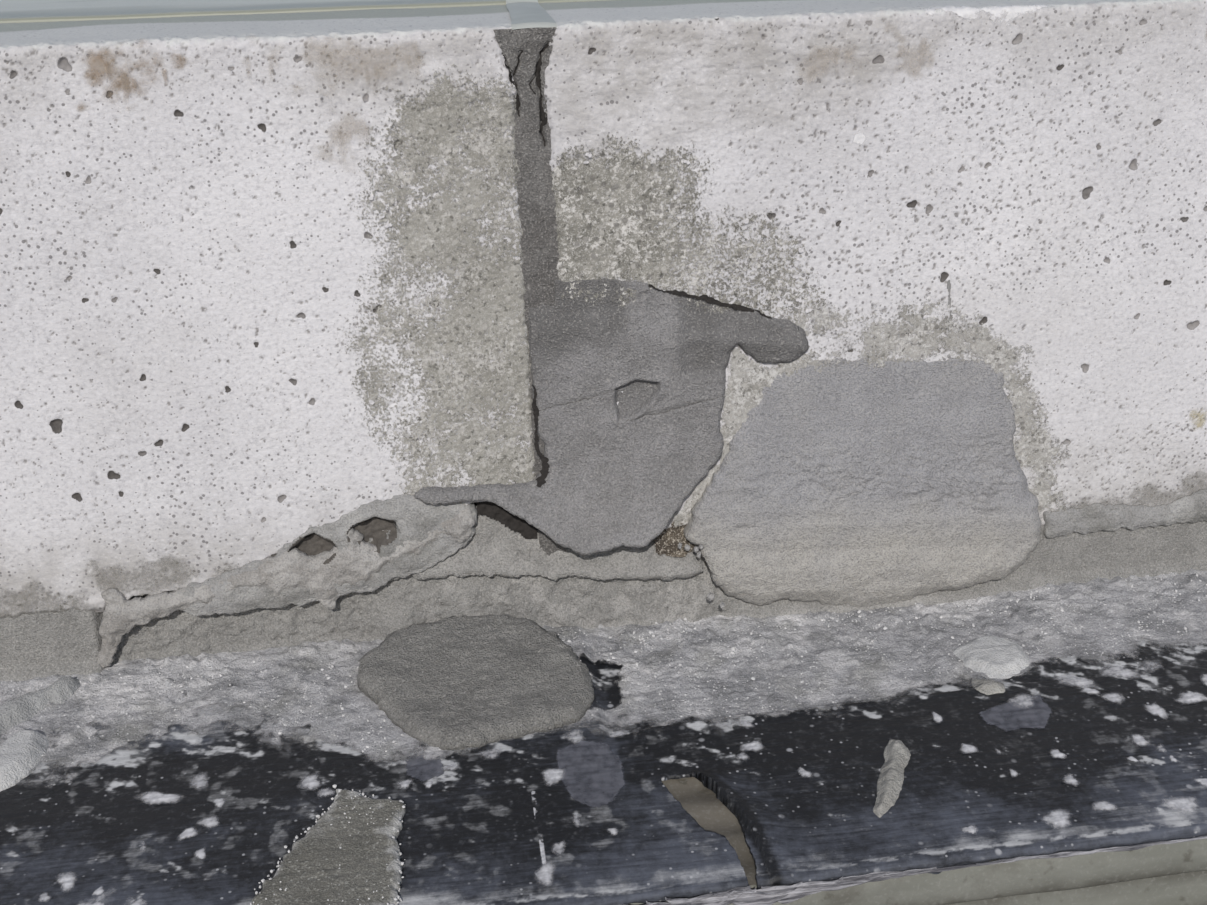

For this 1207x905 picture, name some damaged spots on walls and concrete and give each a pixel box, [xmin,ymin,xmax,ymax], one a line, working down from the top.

crack [503,44,549,146]
crack [648,284,772,319]
crack [532,385,550,487]